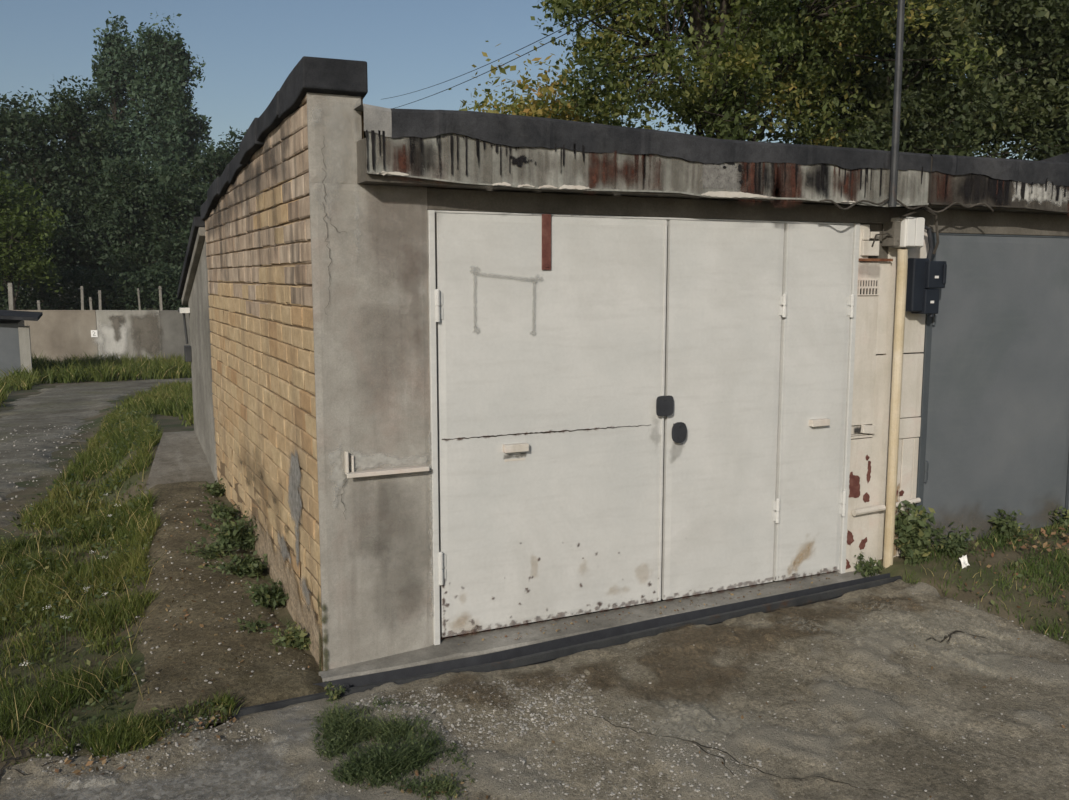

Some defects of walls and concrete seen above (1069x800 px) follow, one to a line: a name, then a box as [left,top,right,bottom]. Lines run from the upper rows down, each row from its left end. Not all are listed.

corrosion [393,144,419,176]
corrosion [589,151,661,189]
corrosion [740,162,801,207]
corrosion [834,167,860,201]
crack [322,136,347,314]